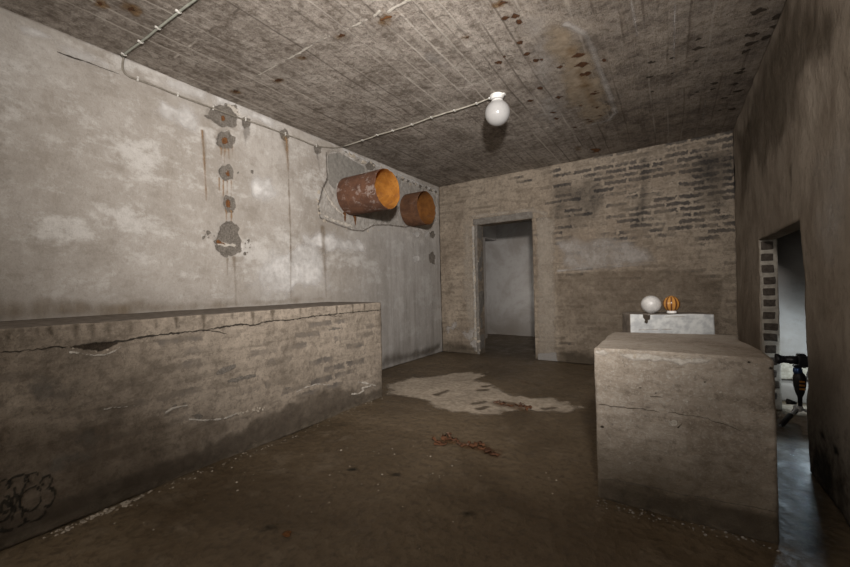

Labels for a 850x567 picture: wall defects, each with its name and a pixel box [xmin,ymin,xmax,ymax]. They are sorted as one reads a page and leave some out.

corrosion [546,22,615,125]
flaking render [204,103,251,149]
flaking render [202,164,251,257]
crack [112,309,381,343]
crack [0,345,65,353]
flaking render [69,341,120,356]
crack [599,396,740,431]